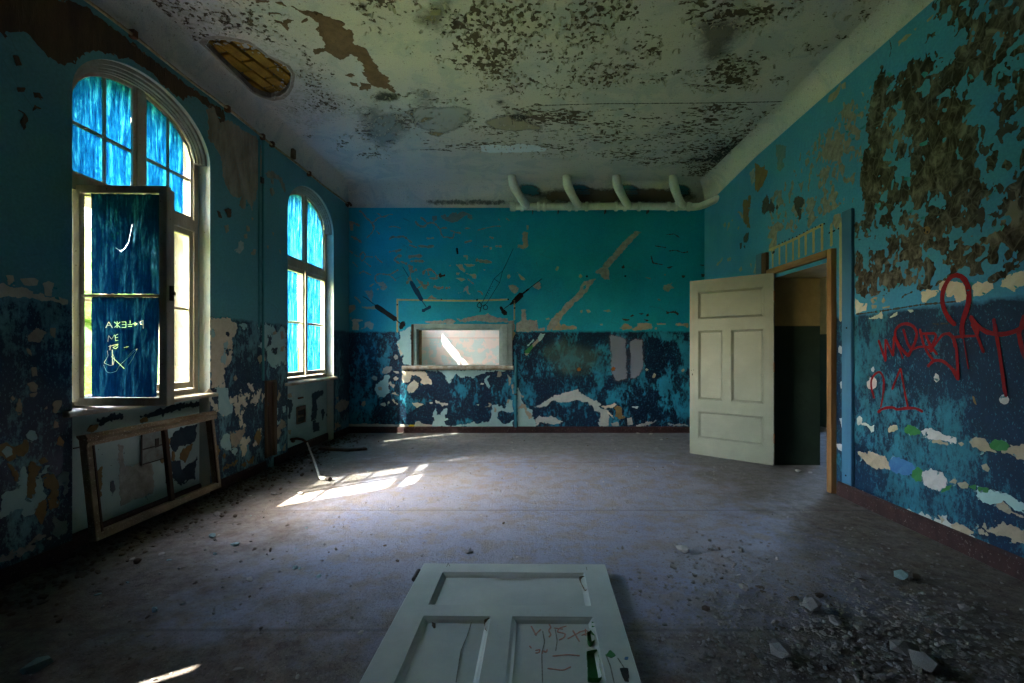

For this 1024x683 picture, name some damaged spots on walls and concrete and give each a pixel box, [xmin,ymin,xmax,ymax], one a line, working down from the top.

spalling [0,0,286,256]
peeling [151,0,889,177]
leakage [691,142,739,162]
flaking render [717,0,1024,319]
peeling [0,275,68,305]
peeling [140,316,293,471]
spalling [425,309,577,356]
peeling [349,327,688,427]
peeling [595,231,641,280]
peeling [0,430,60,562]
peeling [858,450,1024,544]
peeling [888,425,1024,472]